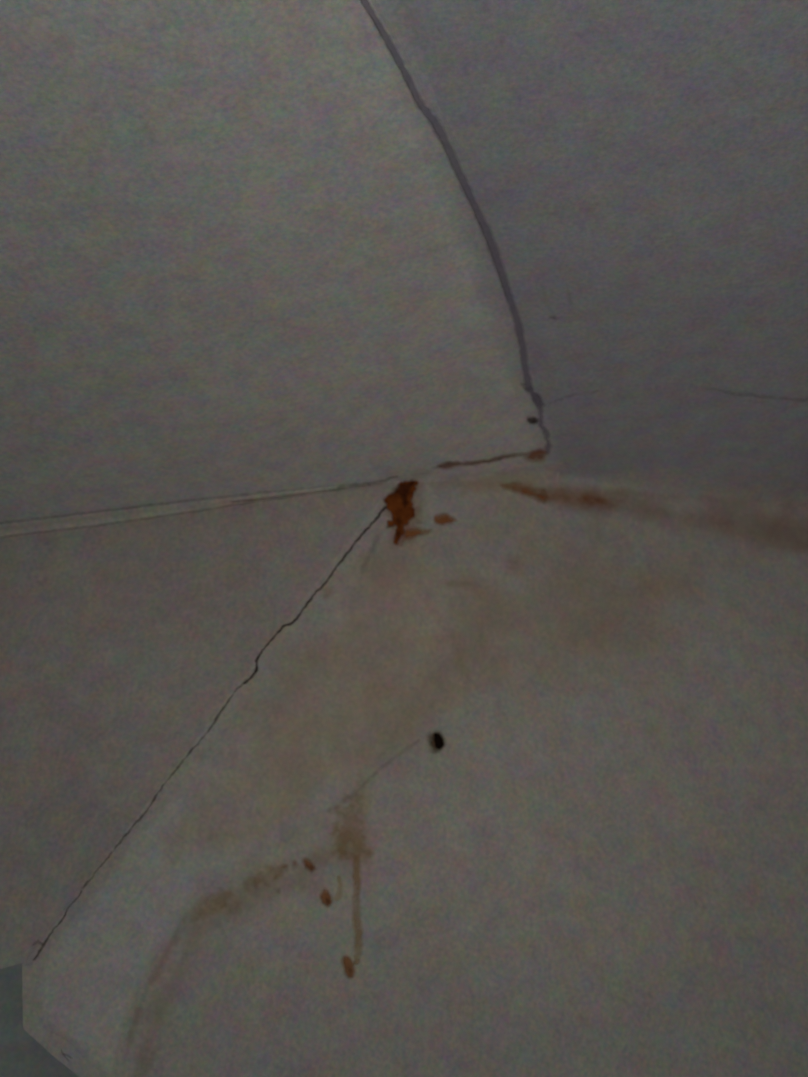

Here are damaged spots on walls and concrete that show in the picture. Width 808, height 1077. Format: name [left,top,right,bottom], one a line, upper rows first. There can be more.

crack [362,0,550,453]
corrosion [384,481,422,545]
corrosion [435,514,455,524]
crack [177,506,387,767]
crack [29,859,107,960]
corrosion [321,890,332,906]
corrosion [343,957,358,977]